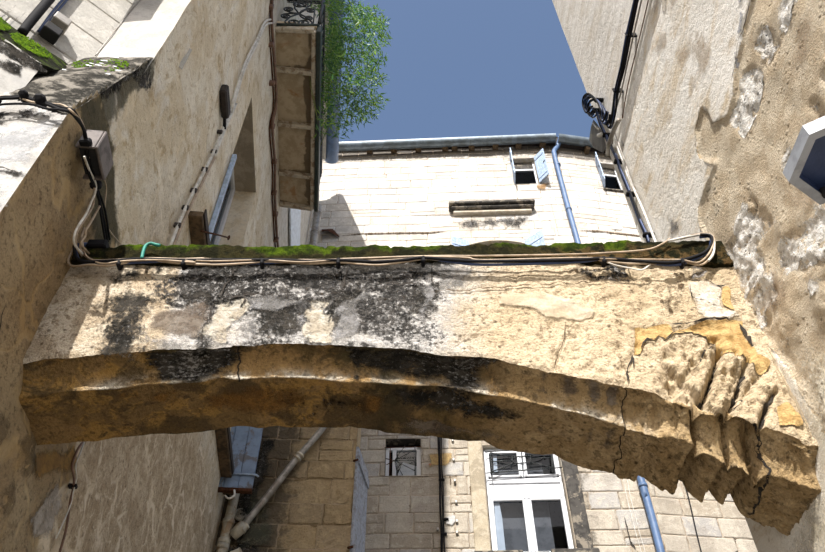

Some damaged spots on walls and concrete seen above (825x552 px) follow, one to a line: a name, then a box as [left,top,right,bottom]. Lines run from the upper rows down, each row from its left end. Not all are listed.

damp [0,108,59,177]
damp [99,262,519,421]
damp [577,264,629,281]
crack [613,279,754,474]
flaking render [634,0,825,430]
crack [748,394,774,515]